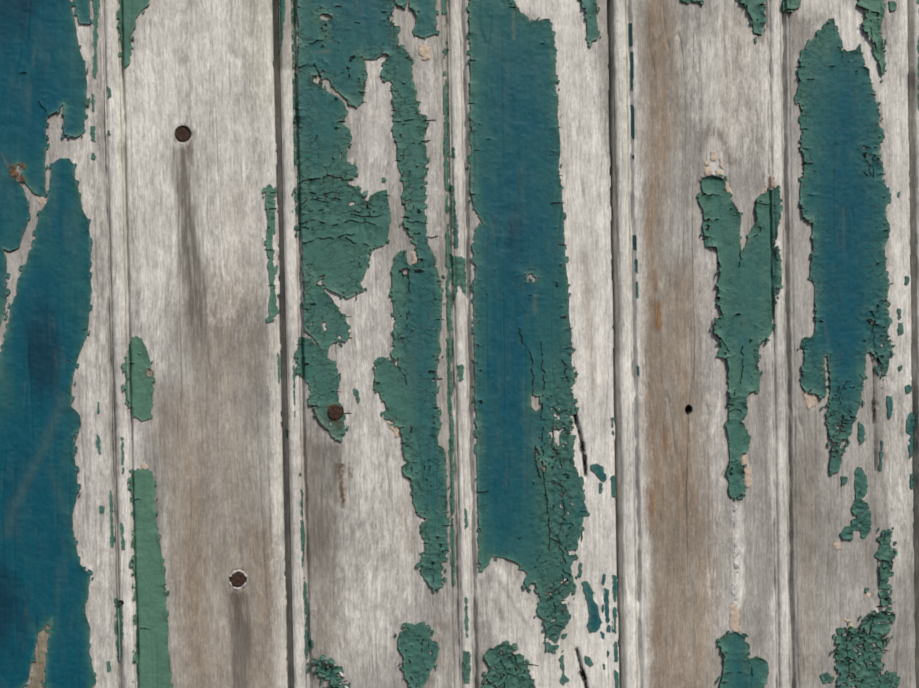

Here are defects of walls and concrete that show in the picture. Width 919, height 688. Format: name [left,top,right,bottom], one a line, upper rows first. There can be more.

peeling [117,0,150,68]
peeling [739,0,767,43]
peeling [782,0,801,13]
peeling [262,184,280,322]
peeling [0,0,101,688]
peeling [122,336,155,421]
peeling [278,0,619,688]
crack [573,414,587,474]
peeling [696,150,783,526]
peeling [794,0,904,688]
peeling [99,437,173,688]
crack [576,649,587,688]